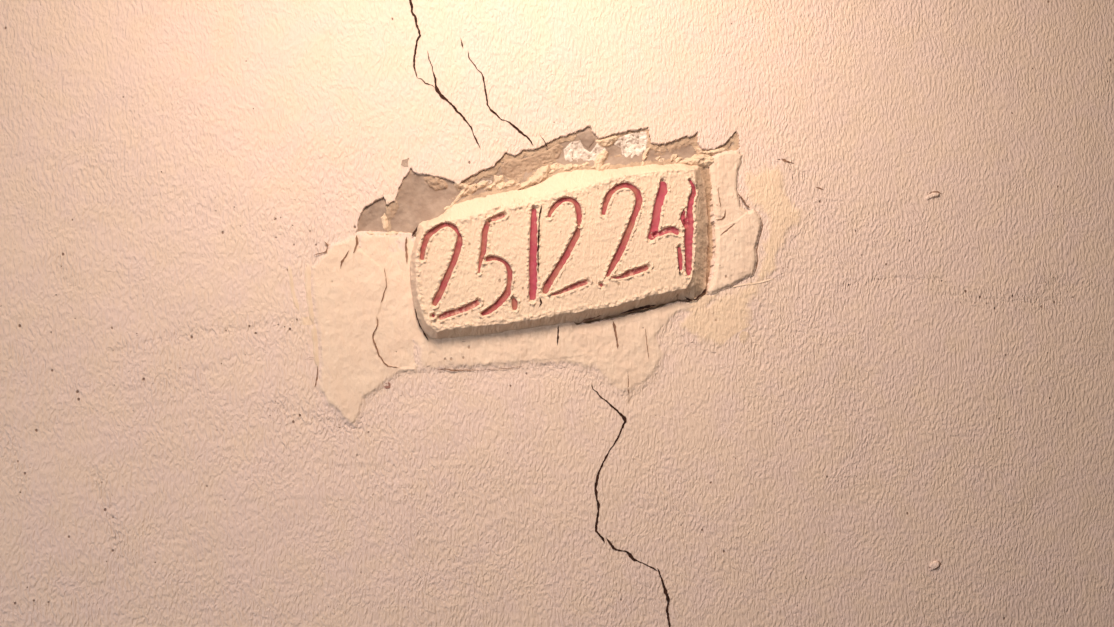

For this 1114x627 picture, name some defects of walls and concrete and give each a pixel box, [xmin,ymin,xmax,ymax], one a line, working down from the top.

crack [409,0,547,147]
spalling [340,127,739,323]
crack [592,378,671,627]